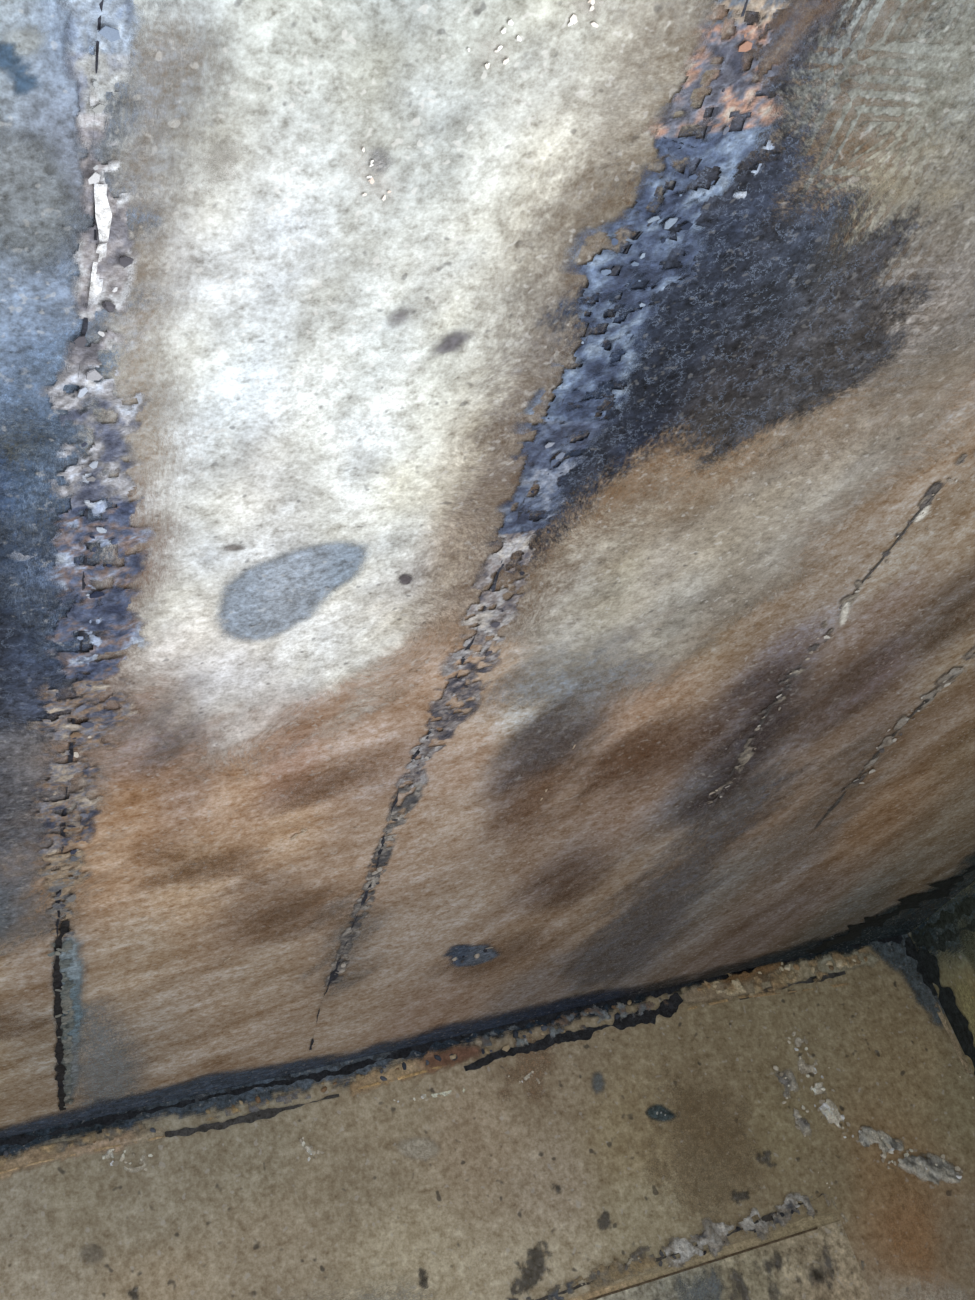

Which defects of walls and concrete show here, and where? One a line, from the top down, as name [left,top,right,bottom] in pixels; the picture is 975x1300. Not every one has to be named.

peeling [0,131,83,267]
leakage [0,0,112,486]
corrosion [93,21,224,618]
crack [0,0,160,1111]
leakage [0,373,975,1139]
crack [309,0,792,1050]
crack [706,452,975,806]
crack [801,648,975,846]
spalling [321,1025,544,1103]
spalling [507,1172,848,1300]
spalling [683,949,880,1010]
peeling [773,1028,963,1185]